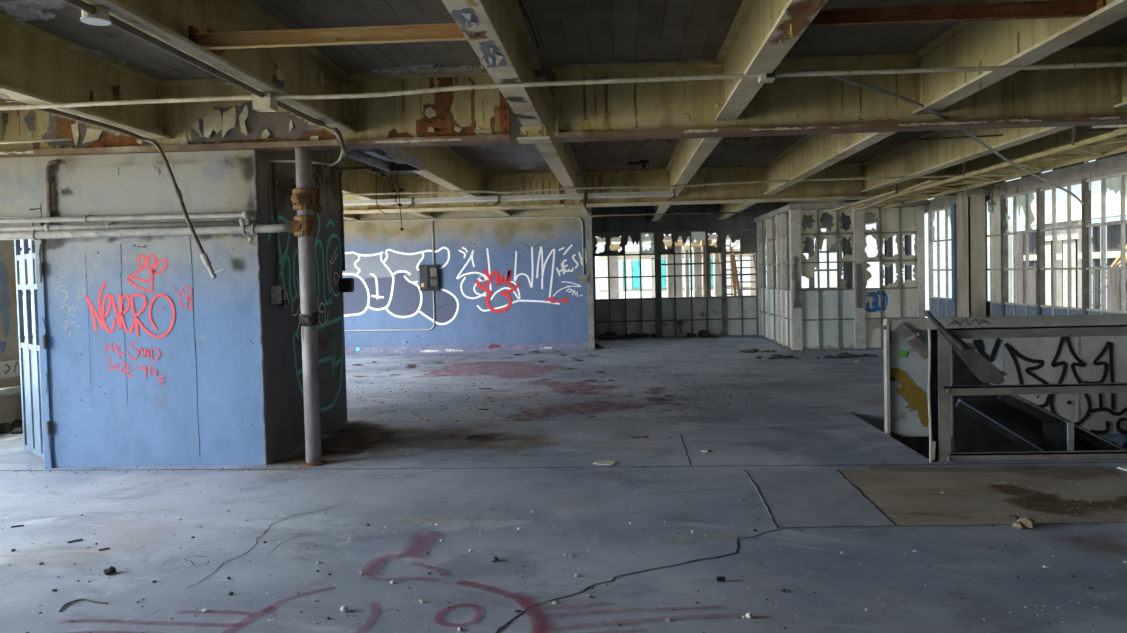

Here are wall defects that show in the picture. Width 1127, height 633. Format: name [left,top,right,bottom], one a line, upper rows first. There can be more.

rust [772,0,824,43]
peeling [359,8,507,143]
peeling [0,110,160,154]
peeling [180,102,338,145]
peeling [899,118,1042,126]
water stain [278,453,306,464]
water stain [321,423,545,461]
water stain [990,485,1127,515]
crack [185,504,342,588]
crack [496,469,1012,633]